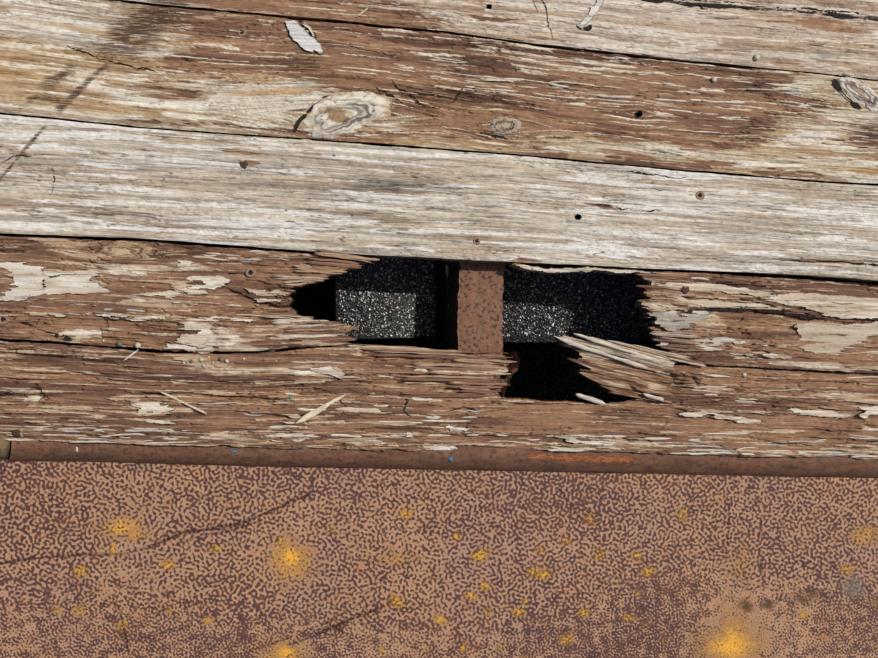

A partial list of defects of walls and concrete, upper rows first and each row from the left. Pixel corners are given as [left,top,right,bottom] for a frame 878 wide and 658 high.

peeling [0,262,112,301]
peeling [129,259,231,300]
peeling [509,263,656,275]
peeling [163,316,253,354]
peeling [643,282,878,355]
peeling [126,390,177,424]
peeling [776,406,878,431]
rust [526,454,632,463]
rust [100,518,143,555]
rust [269,538,313,582]
rust [264,642,306,658]
rust [697,610,765,658]